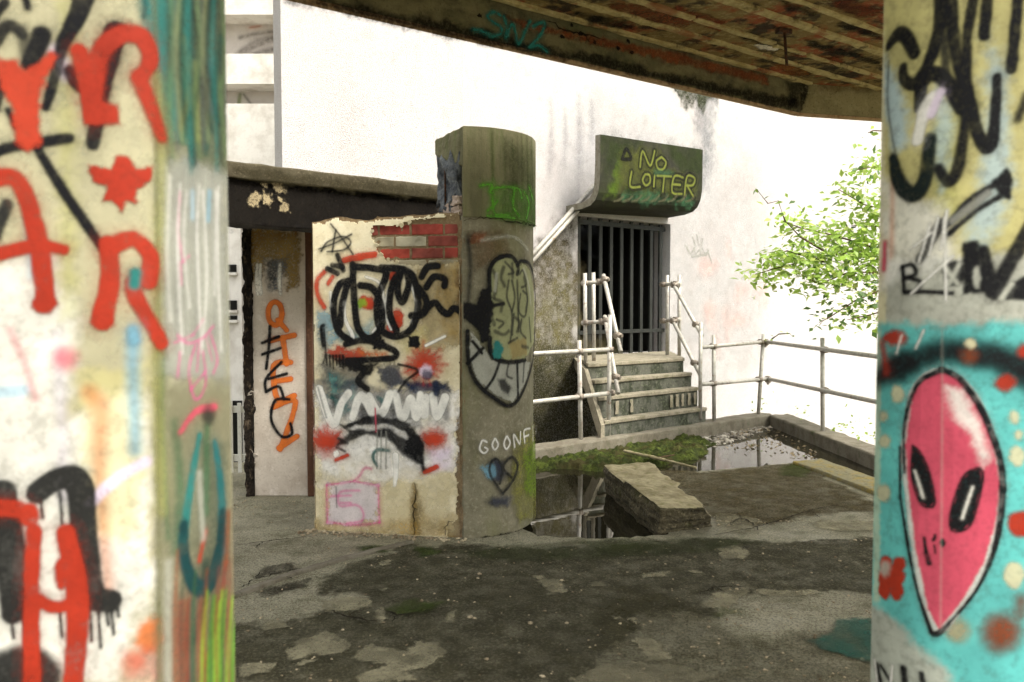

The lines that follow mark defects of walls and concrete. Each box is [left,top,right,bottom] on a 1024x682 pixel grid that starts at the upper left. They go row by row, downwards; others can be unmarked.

rust [608,4,690,27]
rust [512,20,769,85]
rust [774,64,811,76]
peeling [248,182,289,212]
spalling [370,150,462,266]
water stain [235,464,874,682]